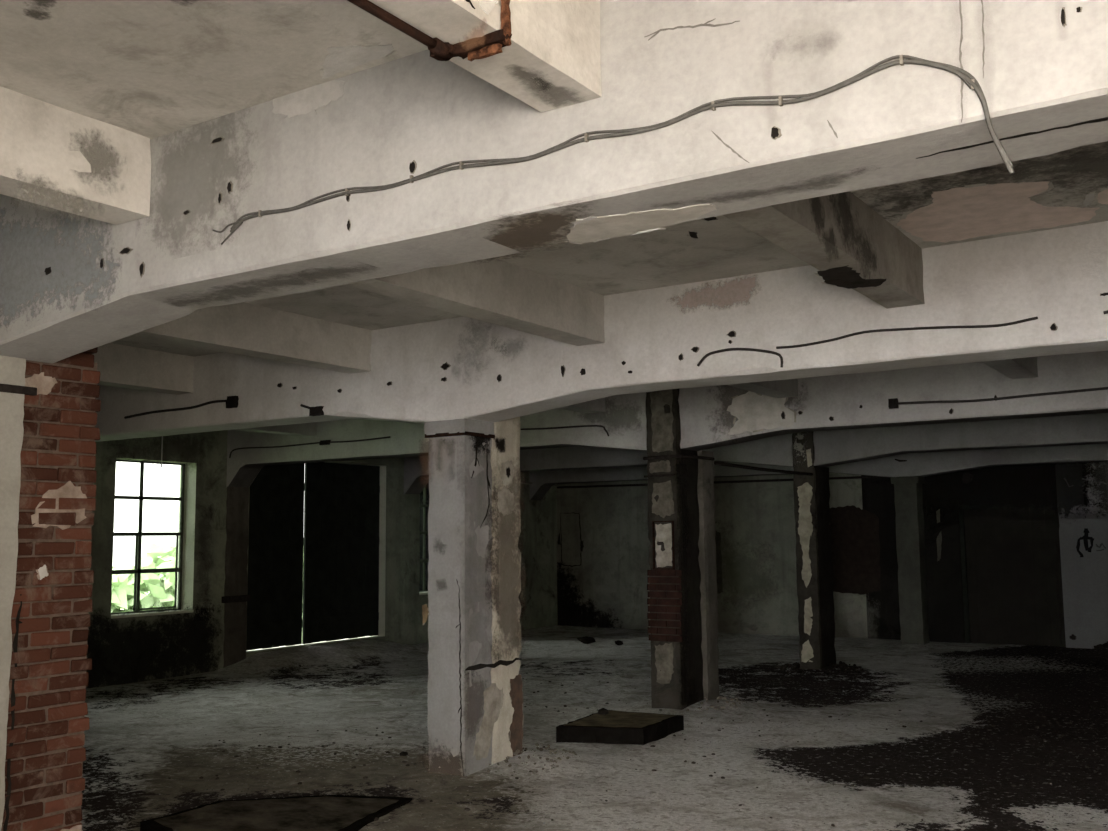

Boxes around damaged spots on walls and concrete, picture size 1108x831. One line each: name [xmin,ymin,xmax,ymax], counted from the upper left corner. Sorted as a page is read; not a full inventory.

crack [645,18,739,41]
crack [916,0,1108,159]
leakage [78,132,119,181]
leakage [19,174,94,214]
peeling [897,181,1108,243]
spalling [814,265,886,289]
peeling [31,481,87,530]
flaking render [647,389,683,684]
leakage [922,462,1108,518]
peeling [797,482,814,663]
crack [456,579,522,777]
peeling [473,674,524,760]